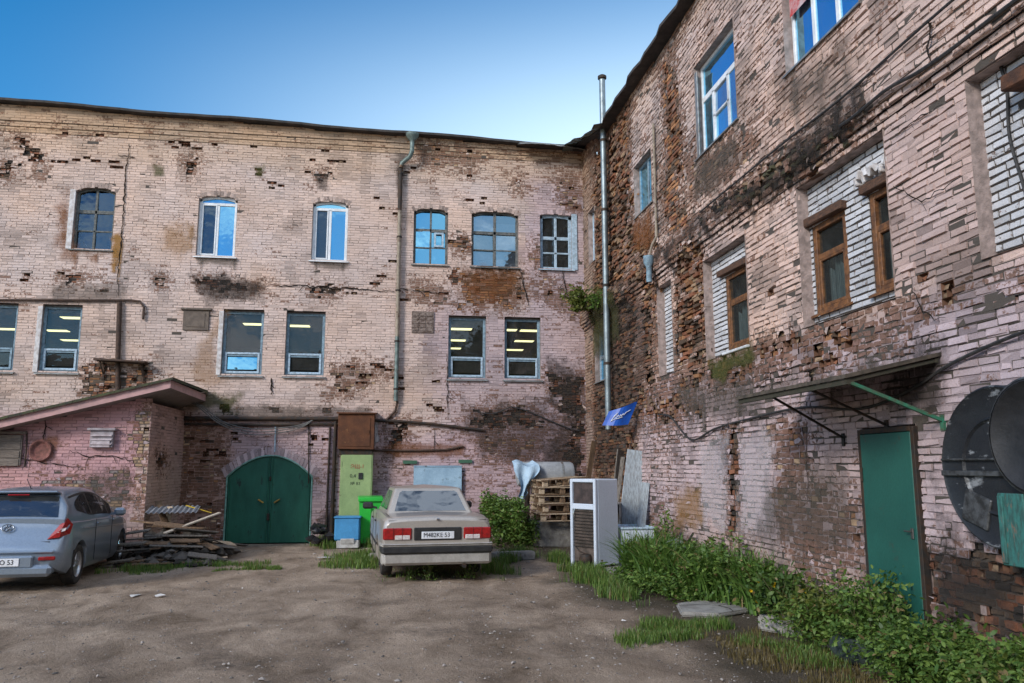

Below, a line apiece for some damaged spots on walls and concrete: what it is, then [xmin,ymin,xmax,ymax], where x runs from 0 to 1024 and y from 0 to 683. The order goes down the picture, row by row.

crack [893,176,962,210]
crack [117,145,135,296]
spalling [195,275,245,293]
crack [277,284,437,295]
spalling [400,246,580,321]
spalling [544,55,878,502]
spalling [76,363,160,397]
peeling [319,360,405,413]
leakage [547,364,583,475]